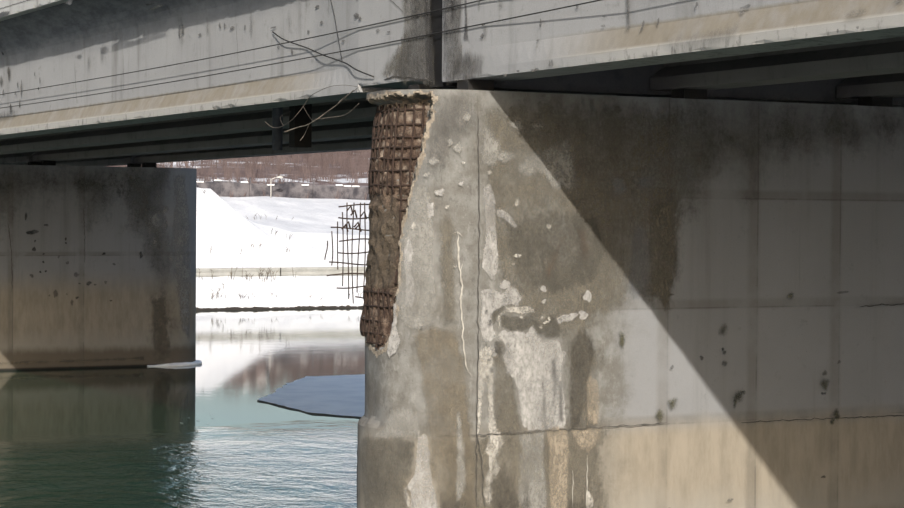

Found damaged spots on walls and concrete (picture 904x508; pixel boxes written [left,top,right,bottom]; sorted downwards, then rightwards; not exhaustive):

leakage [385,0,433,81]
leakage [443,0,476,79]
spalling [324,90,444,358]
peeling [480,280,592,508]
crack [438,118,666,508]
leakage [362,102,811,508]
crack [742,415,904,423]